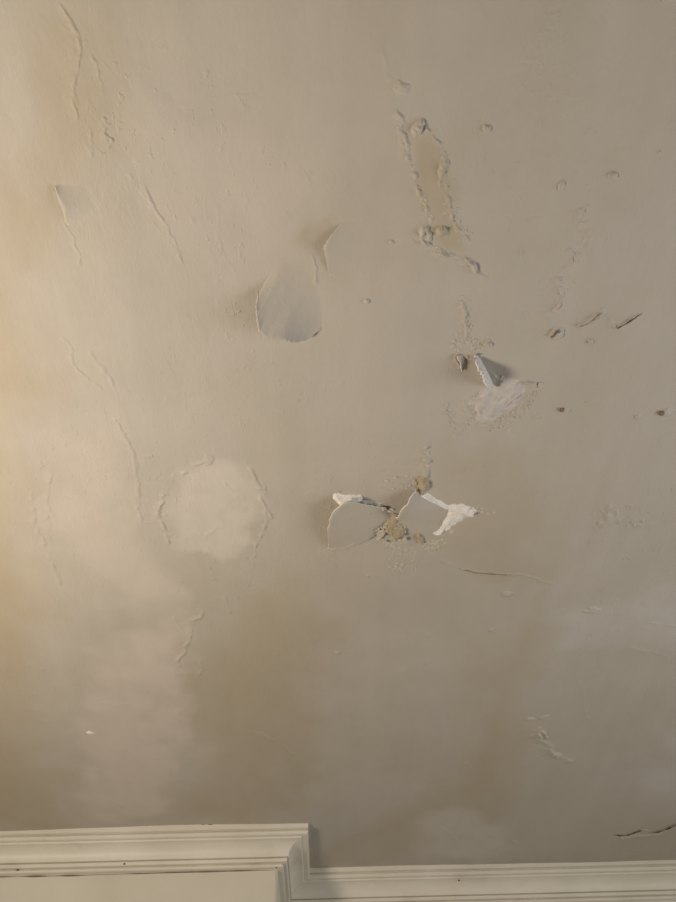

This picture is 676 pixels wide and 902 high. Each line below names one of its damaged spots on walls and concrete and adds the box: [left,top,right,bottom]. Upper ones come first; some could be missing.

peeling [256,263,322,343]
spalling [437,295,544,443]
spalling [317,438,495,574]
crack [608,825,676,842]